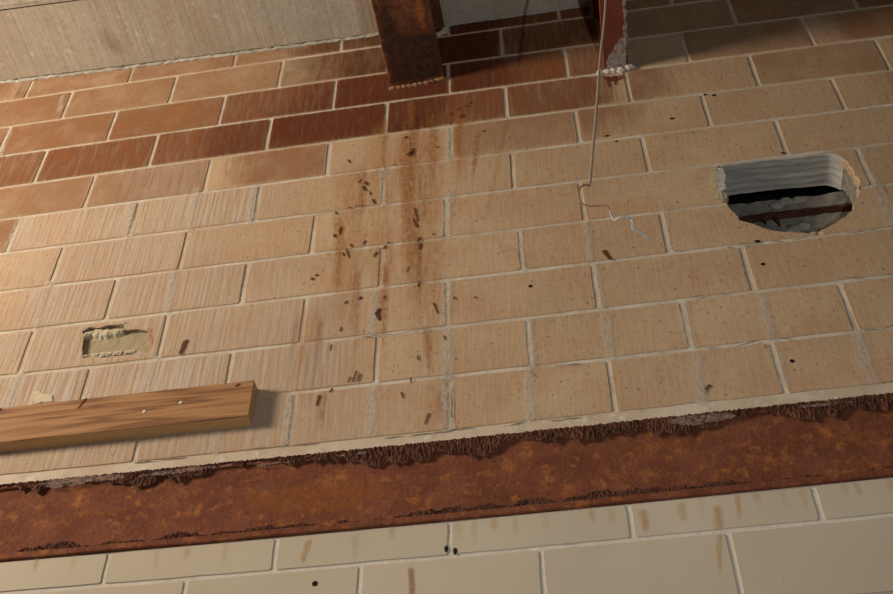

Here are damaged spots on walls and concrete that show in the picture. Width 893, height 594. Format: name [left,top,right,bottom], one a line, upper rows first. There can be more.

corrosion [0,2,623,286]
hole [709,153,860,233]
spalling [83,322,151,358]